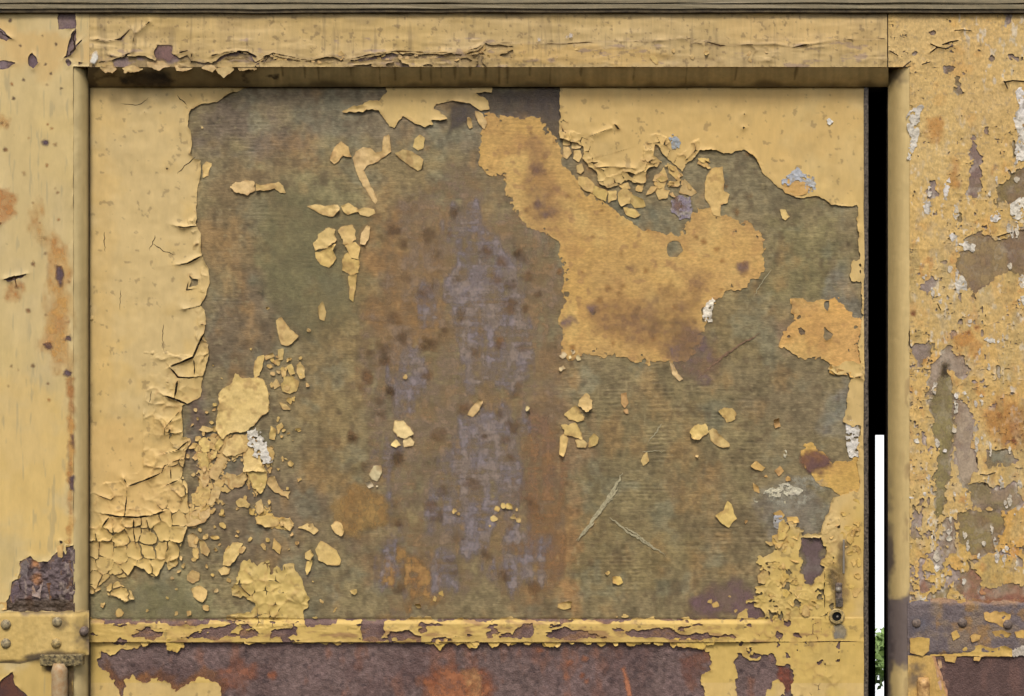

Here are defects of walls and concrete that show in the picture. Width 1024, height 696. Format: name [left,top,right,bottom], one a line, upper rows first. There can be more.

peeling [1000,169,1024,203]
peeling [958,228,1024,296]
corrosion [44,239,74,445]
crack [148,324,204,422]
peeling [91,87,864,621]
crack [101,441,188,543]
corrosion [800,451,831,474]
peeling [911,332,1021,570]
corrosion [0,540,75,628]
corrosion [108,667,255,694]
peeling [425,638,714,651]
corrosion [778,665,793,691]